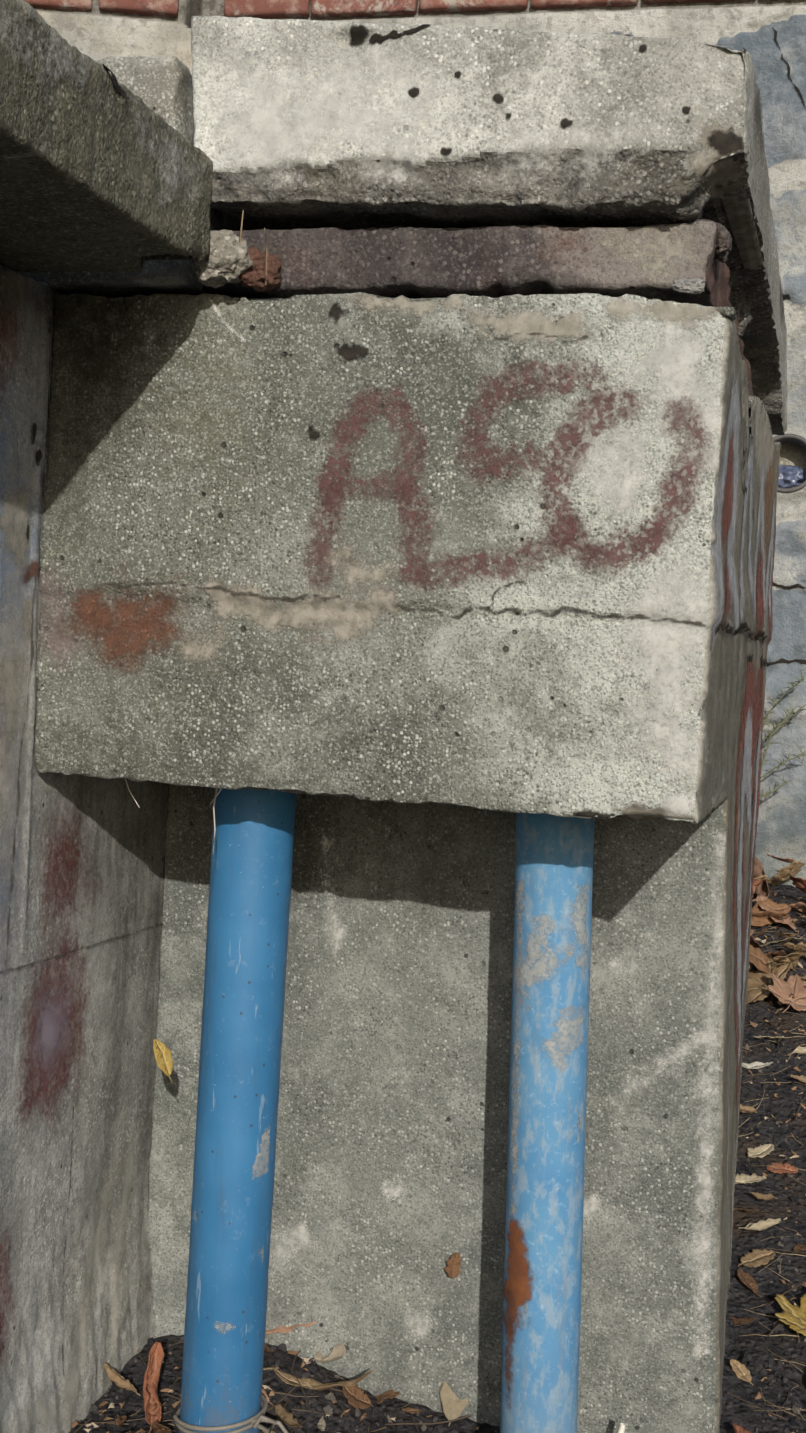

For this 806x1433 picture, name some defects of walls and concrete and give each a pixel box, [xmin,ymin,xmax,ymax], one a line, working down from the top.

damp [211,43,433,181]
damp [502,126,634,176]
spalling [687,121,764,273]
crack [773,30,806,108]
spalling [741,376,780,488]
crack [106,581,340,602]
crack [401,402,806,666]
rust [503,1219,533,1391]